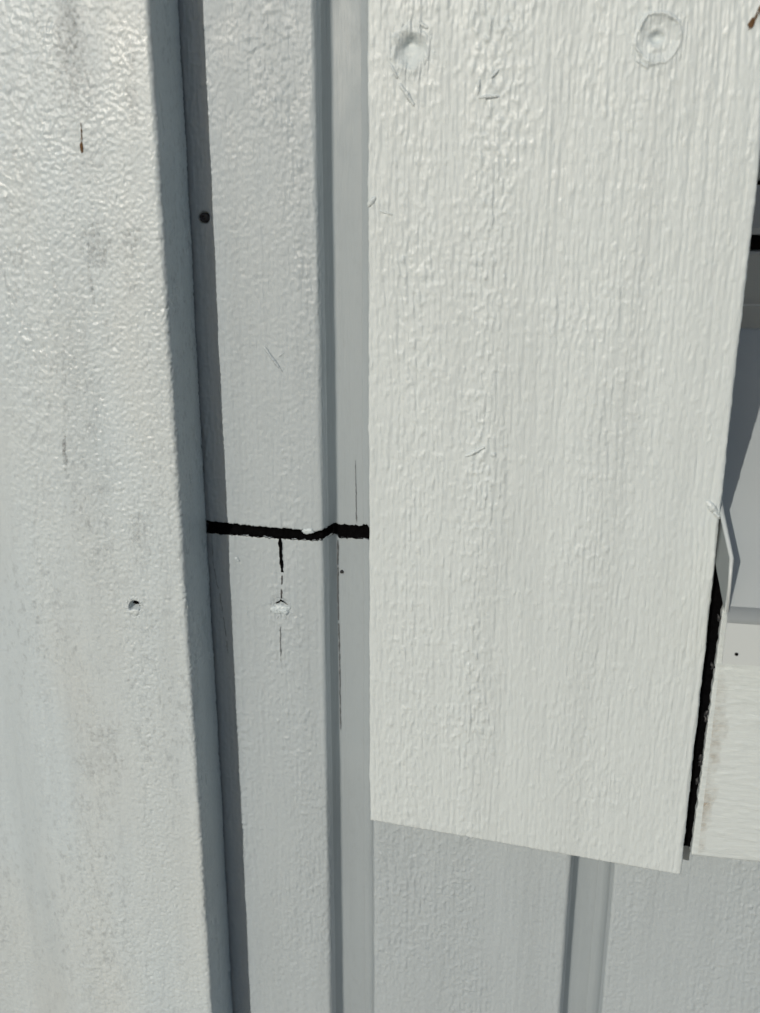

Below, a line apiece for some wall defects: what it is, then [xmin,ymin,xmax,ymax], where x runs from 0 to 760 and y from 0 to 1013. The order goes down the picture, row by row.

crack [206,463,370,728]